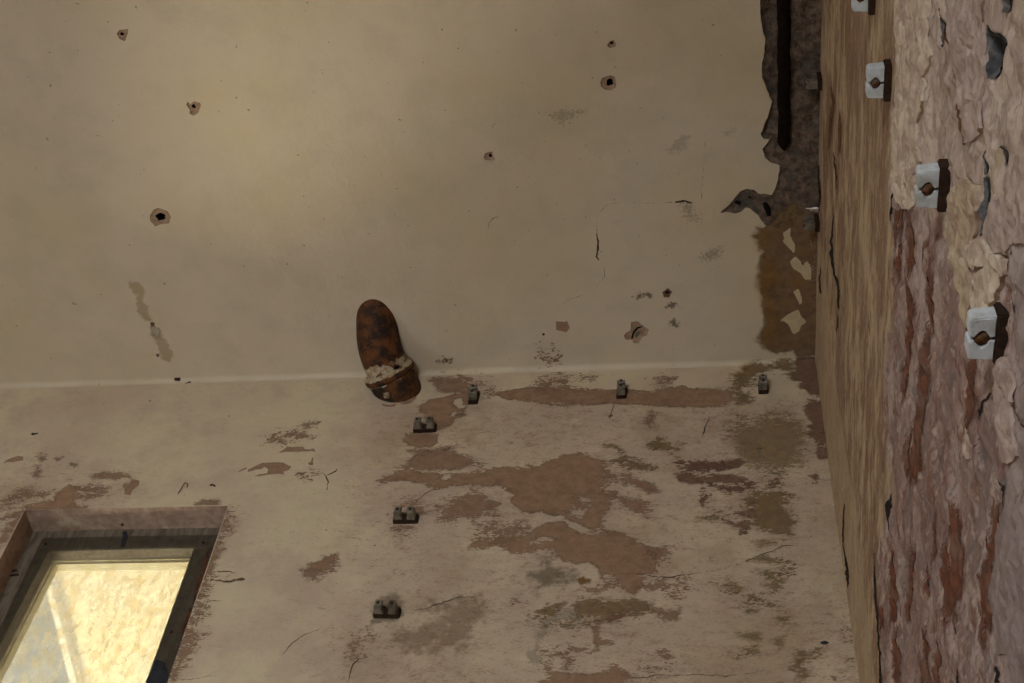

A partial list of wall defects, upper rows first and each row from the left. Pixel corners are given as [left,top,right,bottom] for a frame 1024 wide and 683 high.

spalling [720,0,822,226]
peeling [889,0,1008,210]
crack [571,205,607,299]
peeling [0,453,139,548]
peeling [238,421,320,481]
peeling [375,341,738,625]
peeling [671,457,785,535]
water stain [701,201,827,645]
peeling [789,357,828,459]
peeling [300,552,341,581]
peeling [535,619,676,683]